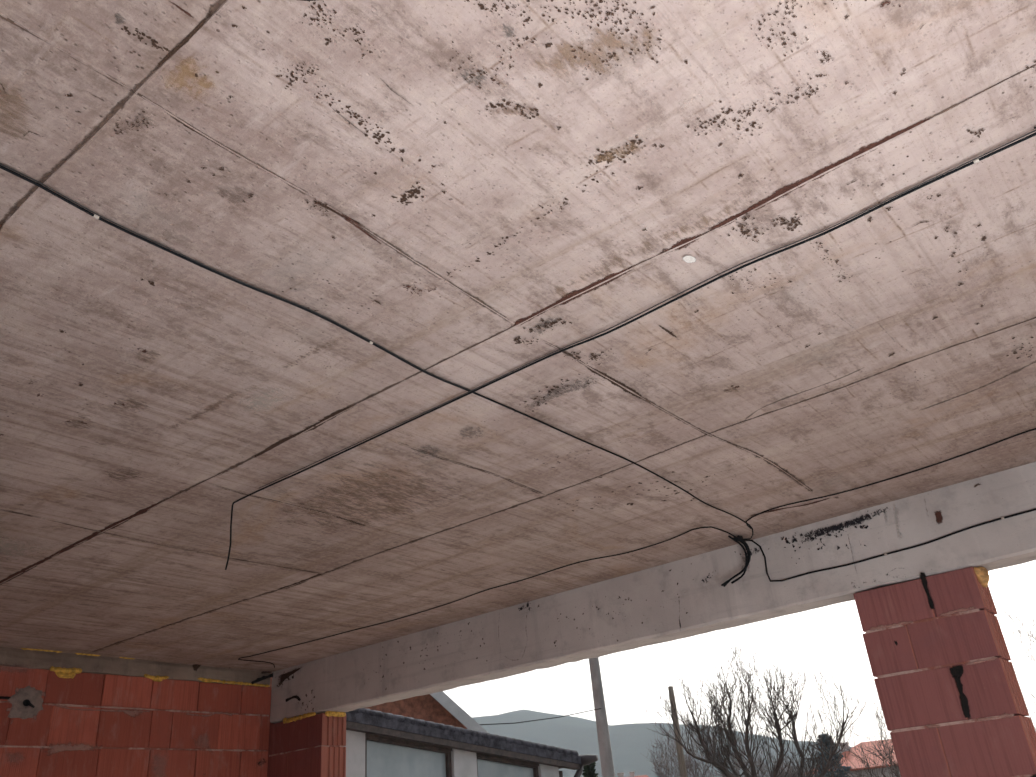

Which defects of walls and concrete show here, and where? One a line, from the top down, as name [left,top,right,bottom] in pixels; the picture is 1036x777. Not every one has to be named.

damp [302,1,376,59]
damp [450,0,662,89]
damp [751,0,815,61]
damp [276,62,405,162]
damp [486,100,539,119]
damp [687,51,833,147]
damp [391,181,425,205]
damp [586,135,665,175]
rust [662,118,930,253]
damp [781,507,888,564]